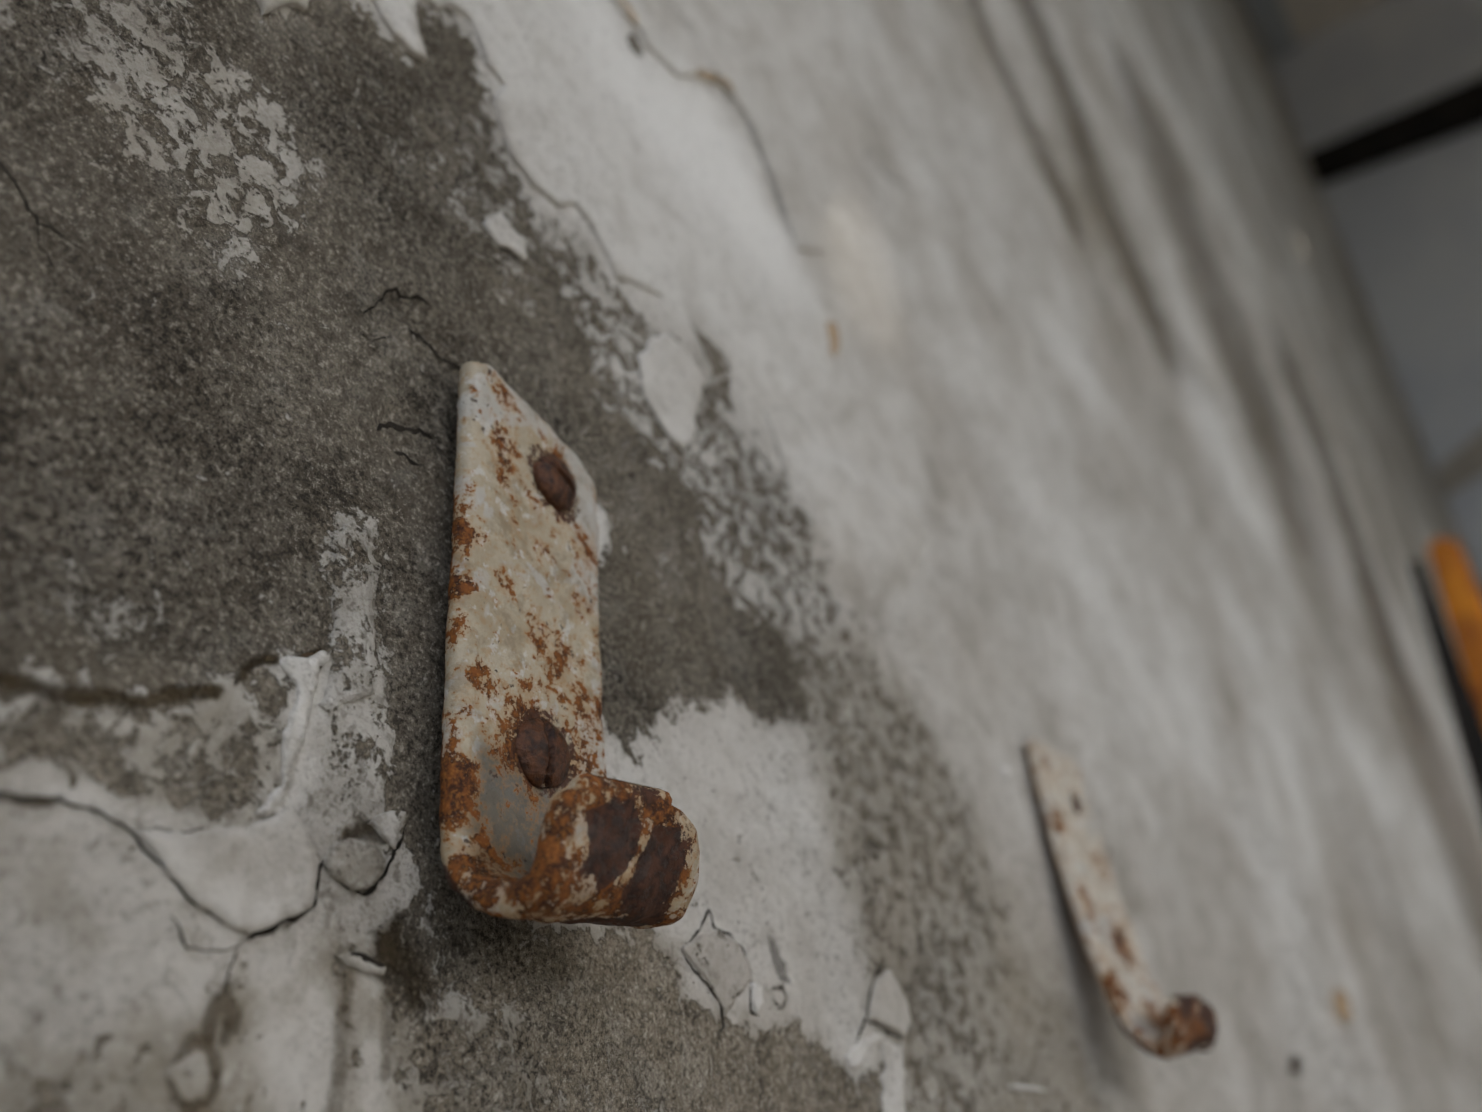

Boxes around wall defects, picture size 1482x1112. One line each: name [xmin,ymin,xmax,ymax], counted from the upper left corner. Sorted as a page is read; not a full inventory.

peeling [257,0,309,16]
peeling [371,0,665,298]
peeling [613,0,828,255]
spalling [377,421,433,440]
peeling [637,322,736,451]
flaking render [136,522,406,934]
crack [0,792,324,997]
spalling [334,951,387,976]
peeling [681,909,764,1032]
spalling [769,936,789,983]
peeling [844,966,912,1112]